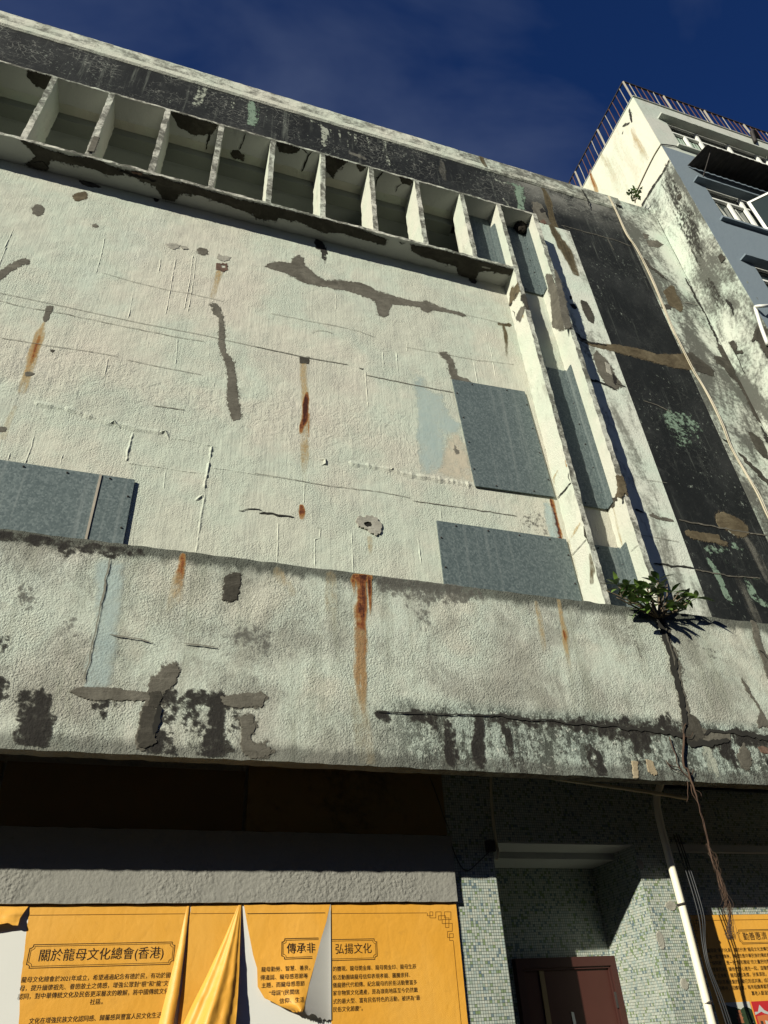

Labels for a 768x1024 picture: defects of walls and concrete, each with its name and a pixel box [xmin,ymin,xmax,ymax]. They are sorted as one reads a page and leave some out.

spalling [325,155,366,179]
corrosion [22,323,44,387]
corrosion [299,363,310,462]
flaking render [593,350,622,391]
spalling [714,342,761,423]
flaking render [751,325,768,358]
corrosion [351,574,372,701]
water stain [0,676,62,747]
mould [146,688,241,757]
water stain [410,708,682,776]
crack [375,618,768,748]
water stain [702,727,768,778]